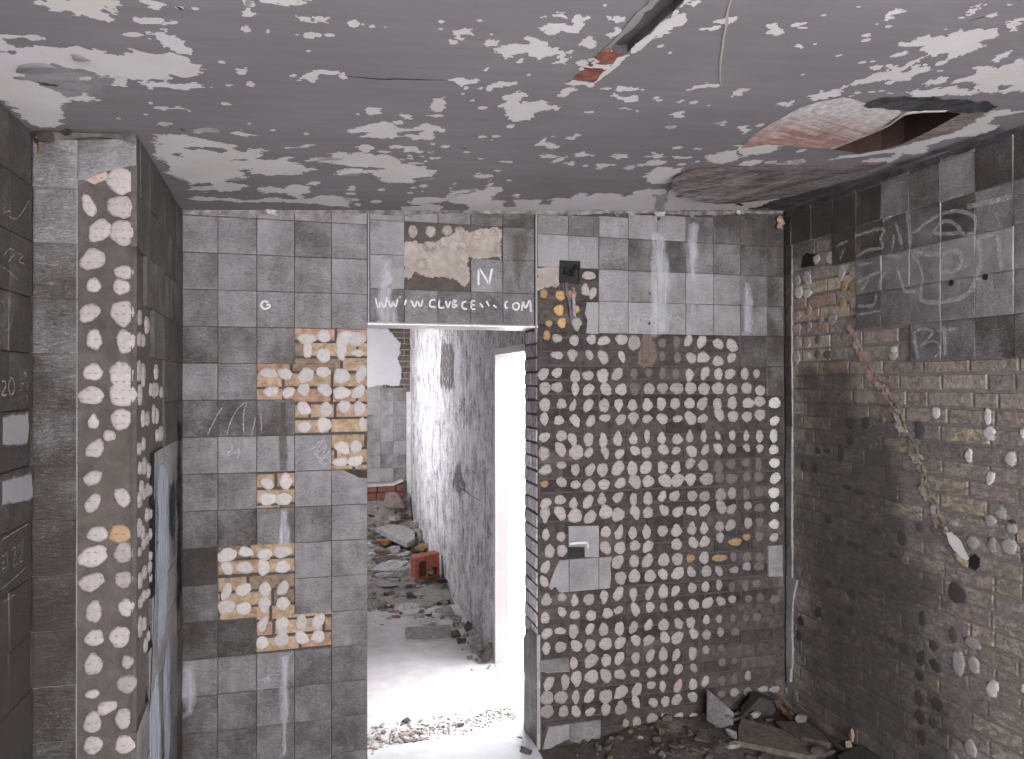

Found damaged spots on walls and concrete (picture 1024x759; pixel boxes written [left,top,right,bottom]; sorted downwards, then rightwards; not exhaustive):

crack [343,73,424,81]
peeling [808,3,1024,101]
peeling [0,0,807,292]
peeling [829,109,1024,163]
peeling [257,328,367,478]
flaking render [383,328,410,392]
peeling [257,473,295,508]
peeling [218,542,331,652]